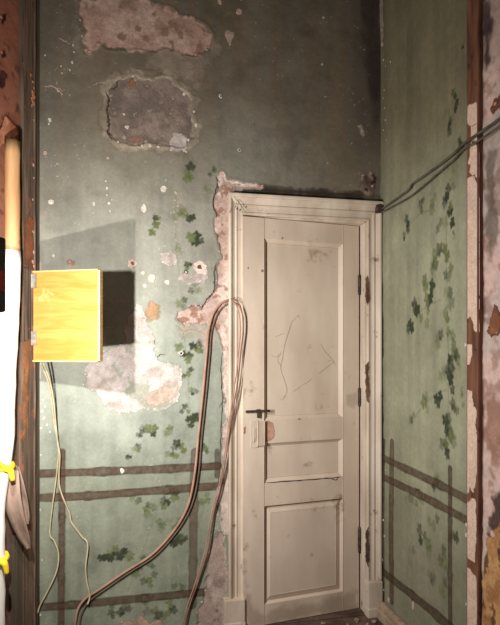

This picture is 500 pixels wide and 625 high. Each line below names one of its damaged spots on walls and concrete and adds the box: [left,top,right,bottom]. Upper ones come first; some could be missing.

flaking render [76,0,212,57]
flaking render [106,75,197,153]
flaking render [490,96,500,114]
corrosion [25,216,34,270]
peeling [467,102,500,337]
corrosion [22,340,32,438]
peeling [83,304,182,414]
flaking render [176,172,263,625]
peeling [464,343,472,365]
flaking render [465,390,500,625]